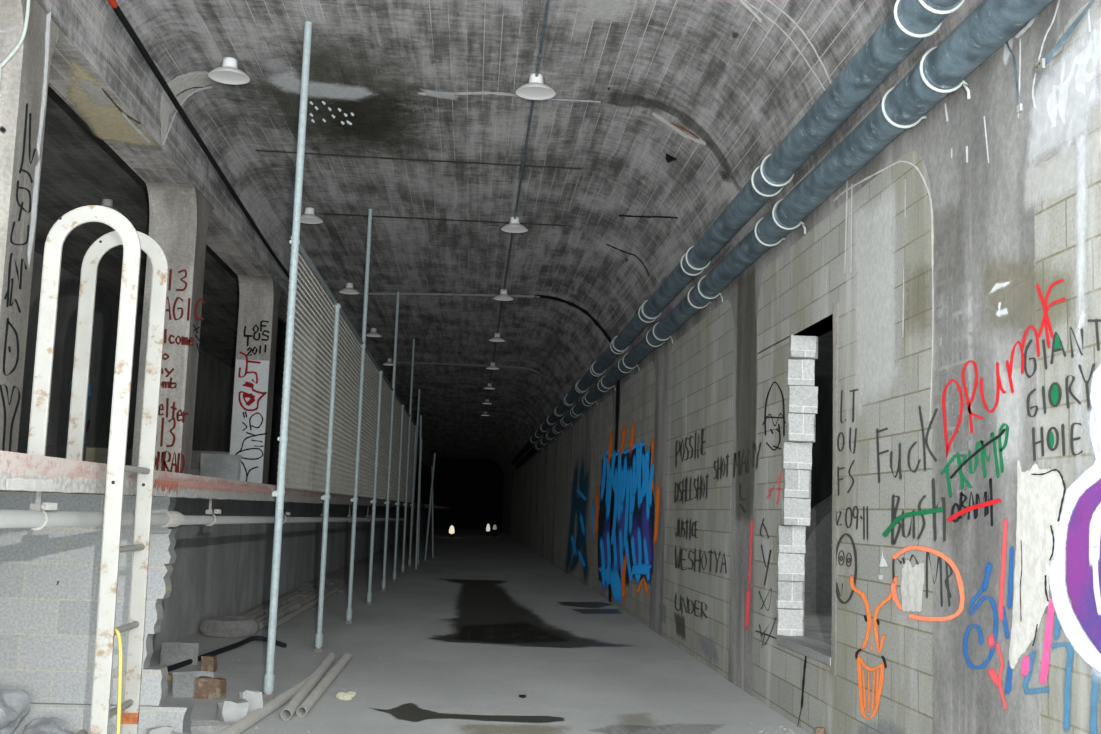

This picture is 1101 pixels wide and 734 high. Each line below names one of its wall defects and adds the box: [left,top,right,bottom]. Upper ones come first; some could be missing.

damp [432,579,624,648]
damp [375,703,564,734]